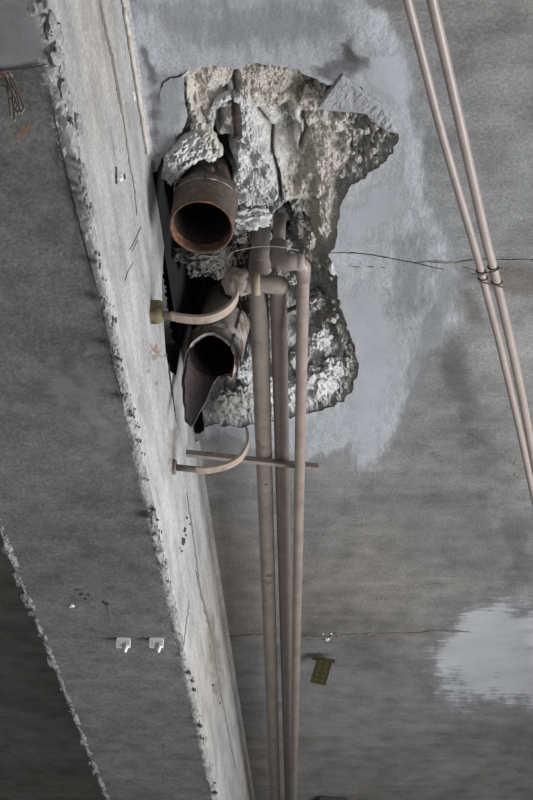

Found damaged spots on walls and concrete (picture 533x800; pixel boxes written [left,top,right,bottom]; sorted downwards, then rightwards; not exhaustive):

spalling [161,63,399,435]
crack [343,252,445,270]